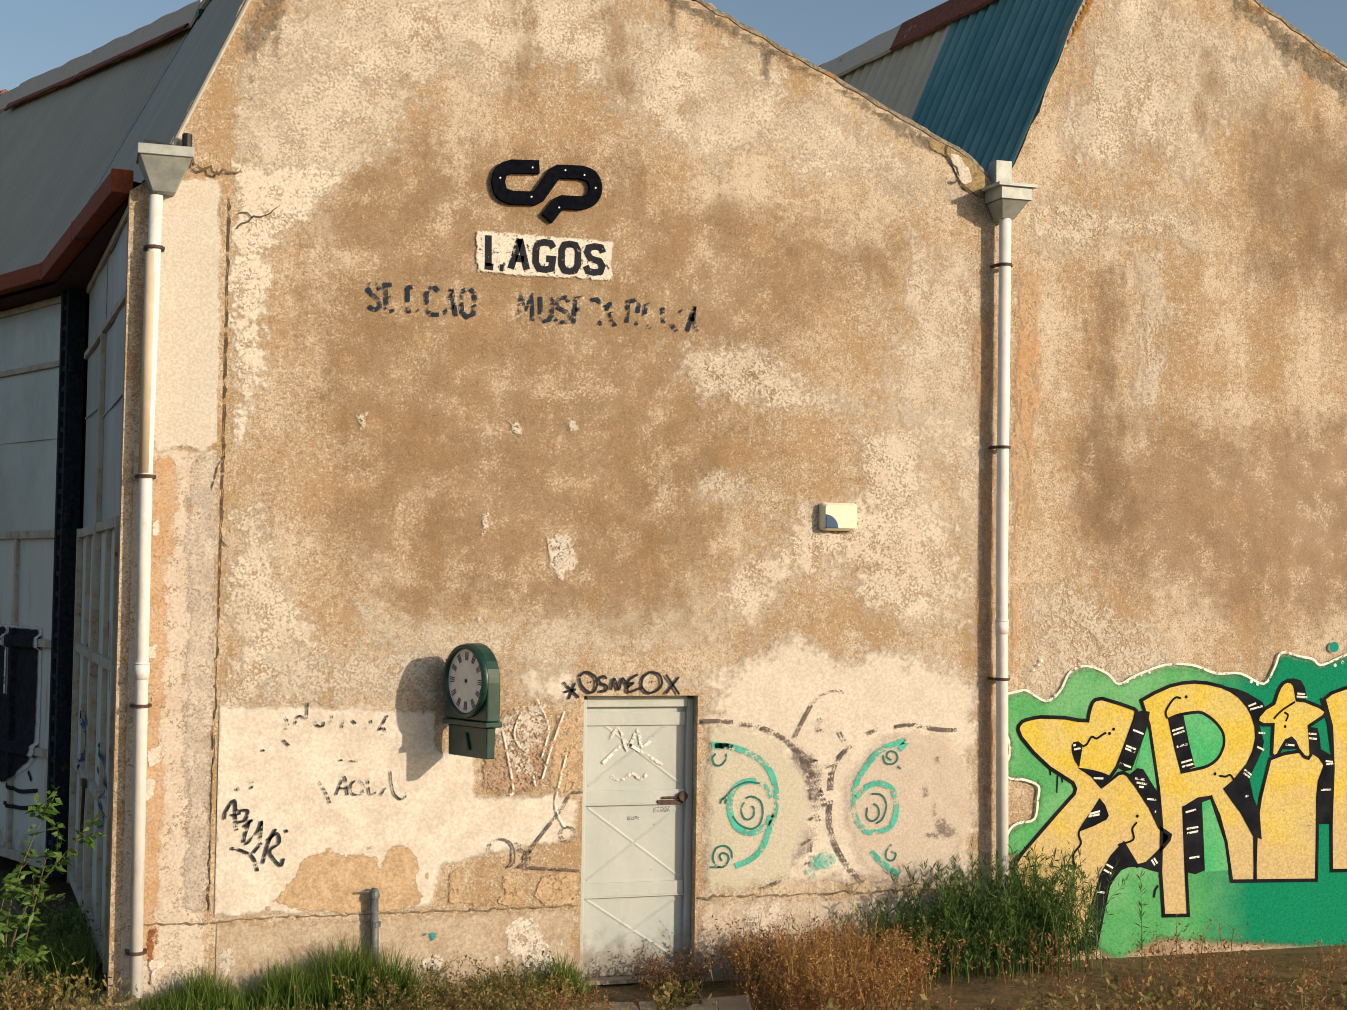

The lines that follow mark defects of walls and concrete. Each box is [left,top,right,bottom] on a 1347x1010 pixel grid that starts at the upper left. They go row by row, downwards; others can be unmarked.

leakage [670,0,934,150]
leakage [1235,0,1347,106]
leakage [1250,108,1347,309]
peeling [547,534,578,580]
leakage [1080,362,1347,616]
peeling [143,452,219,984]
flaking render [482,709,581,799]
peeling [216,845,578,999]